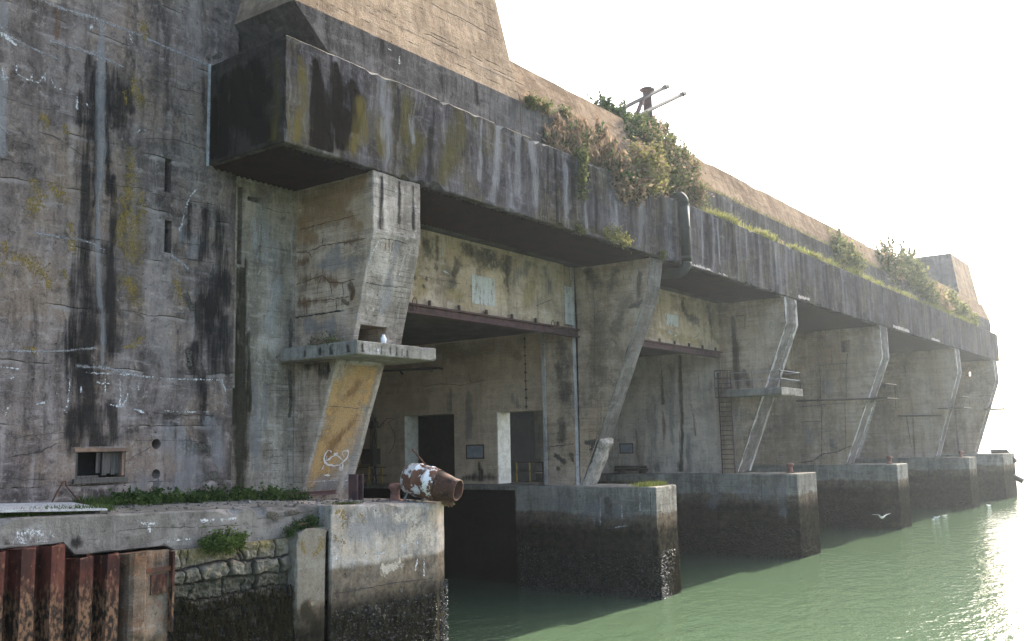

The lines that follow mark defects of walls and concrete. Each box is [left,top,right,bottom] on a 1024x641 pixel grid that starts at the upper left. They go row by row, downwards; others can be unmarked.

water stain [56,55,154,451]
water stain [168,189,252,491]
crack [258,208,405,318]
water stain [309,58,366,153]